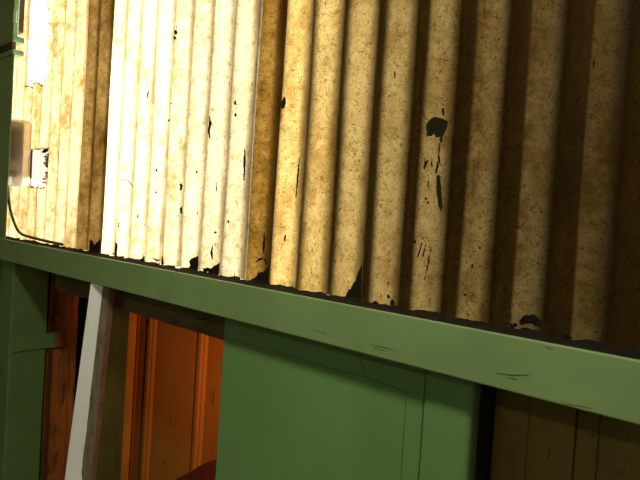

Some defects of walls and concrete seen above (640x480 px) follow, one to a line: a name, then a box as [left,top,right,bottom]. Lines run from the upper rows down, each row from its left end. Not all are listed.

peeling [426,108,448,153]